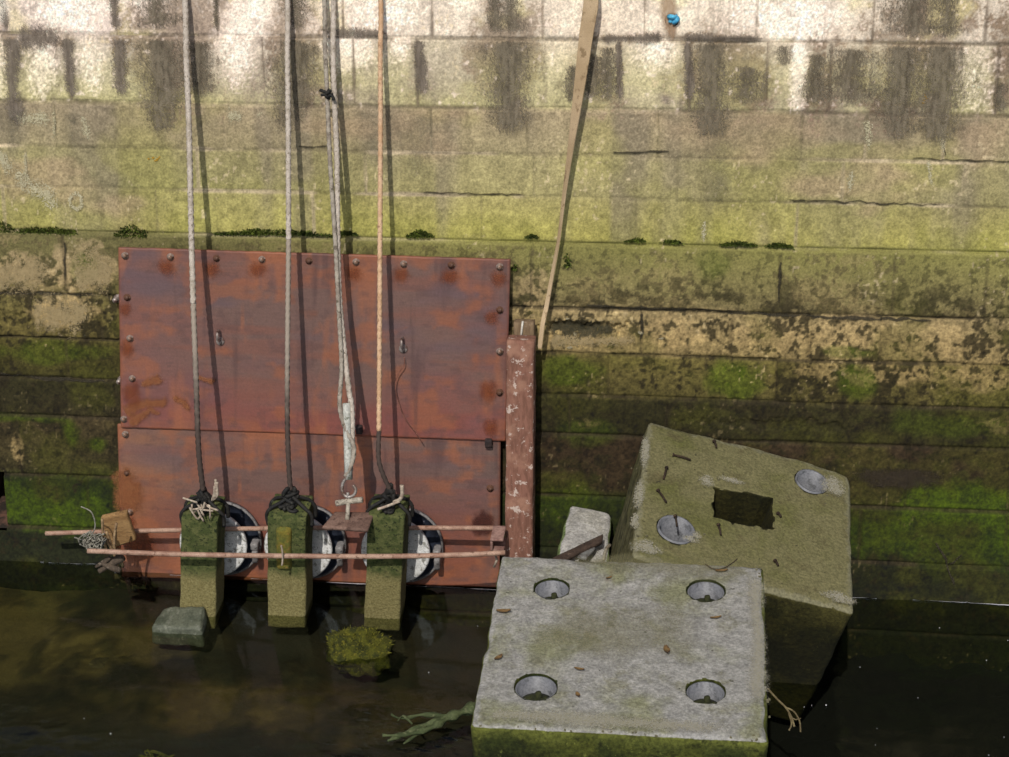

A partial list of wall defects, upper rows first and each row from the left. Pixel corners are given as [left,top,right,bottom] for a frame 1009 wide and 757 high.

damp [108,0,121,27]
damp [2,25,78,137]
damp [110,0,220,130]
damp [478,0,536,133]
damp [563,32,661,101]
damp [683,32,768,136]
damp [798,0,978,152]
crack [917,144,1009,162]
crack [790,198,940,206]
rust [113,469,140,524]
rust [123,538,153,558]
rust [473,513,492,534]